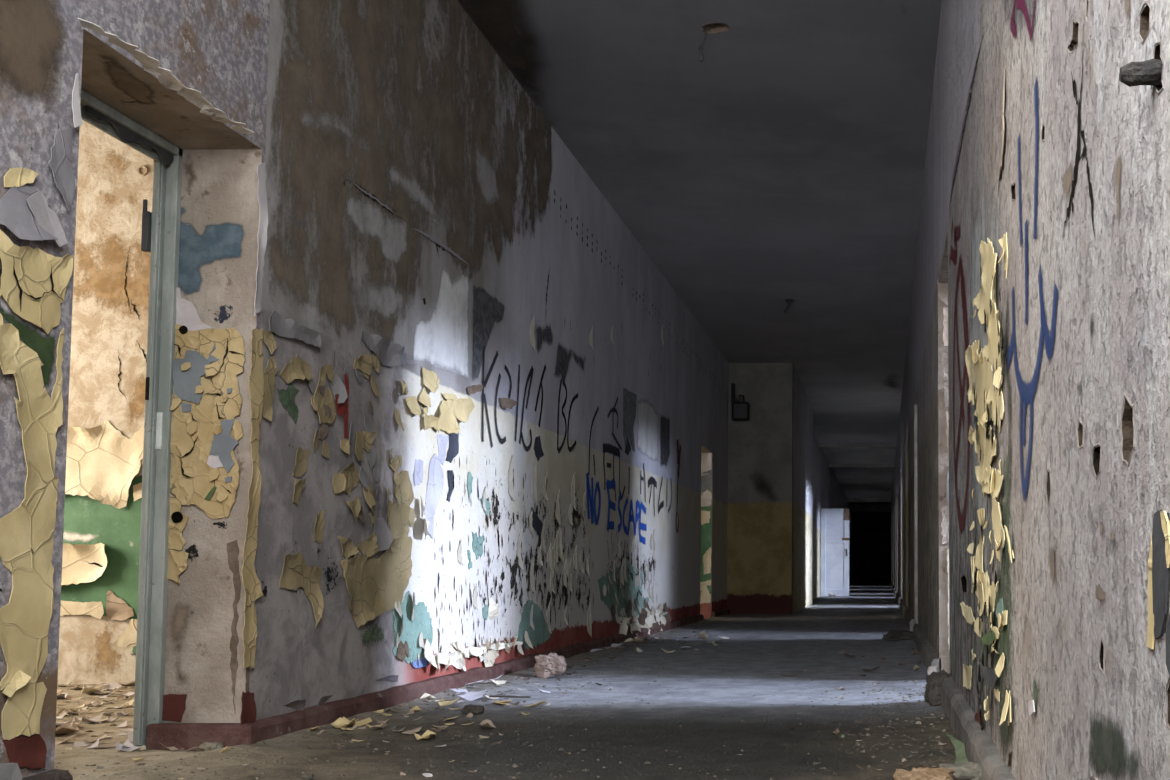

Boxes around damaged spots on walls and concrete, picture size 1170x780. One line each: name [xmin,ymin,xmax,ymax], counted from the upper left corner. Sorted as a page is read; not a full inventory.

peeling [72,73,83,127]
spalling [77,18,255,134]
crack [1063,52,1095,237]
spalling [1139,1,1164,96]
peeling [0,167,144,780]
peeling [167,162,672,725]
spalling [937,280,949,449]
peeling [941,232,1014,731]
peeling [162,694,187,722]
peeling [1147,510,1170,731]